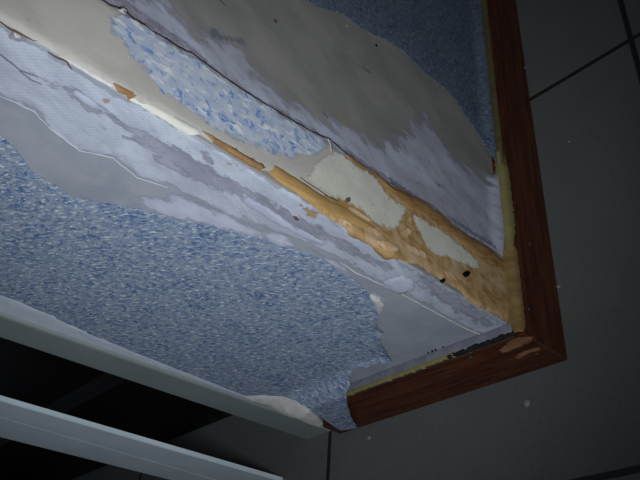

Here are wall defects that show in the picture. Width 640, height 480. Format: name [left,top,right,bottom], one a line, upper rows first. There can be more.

spalling [0,22,34,42]
crack [102,0,351,156]
leakage [63,87,392,270]
spalling [48,52,526,333]
leakage [451,0,515,250]
peeling [0,295,244,397]